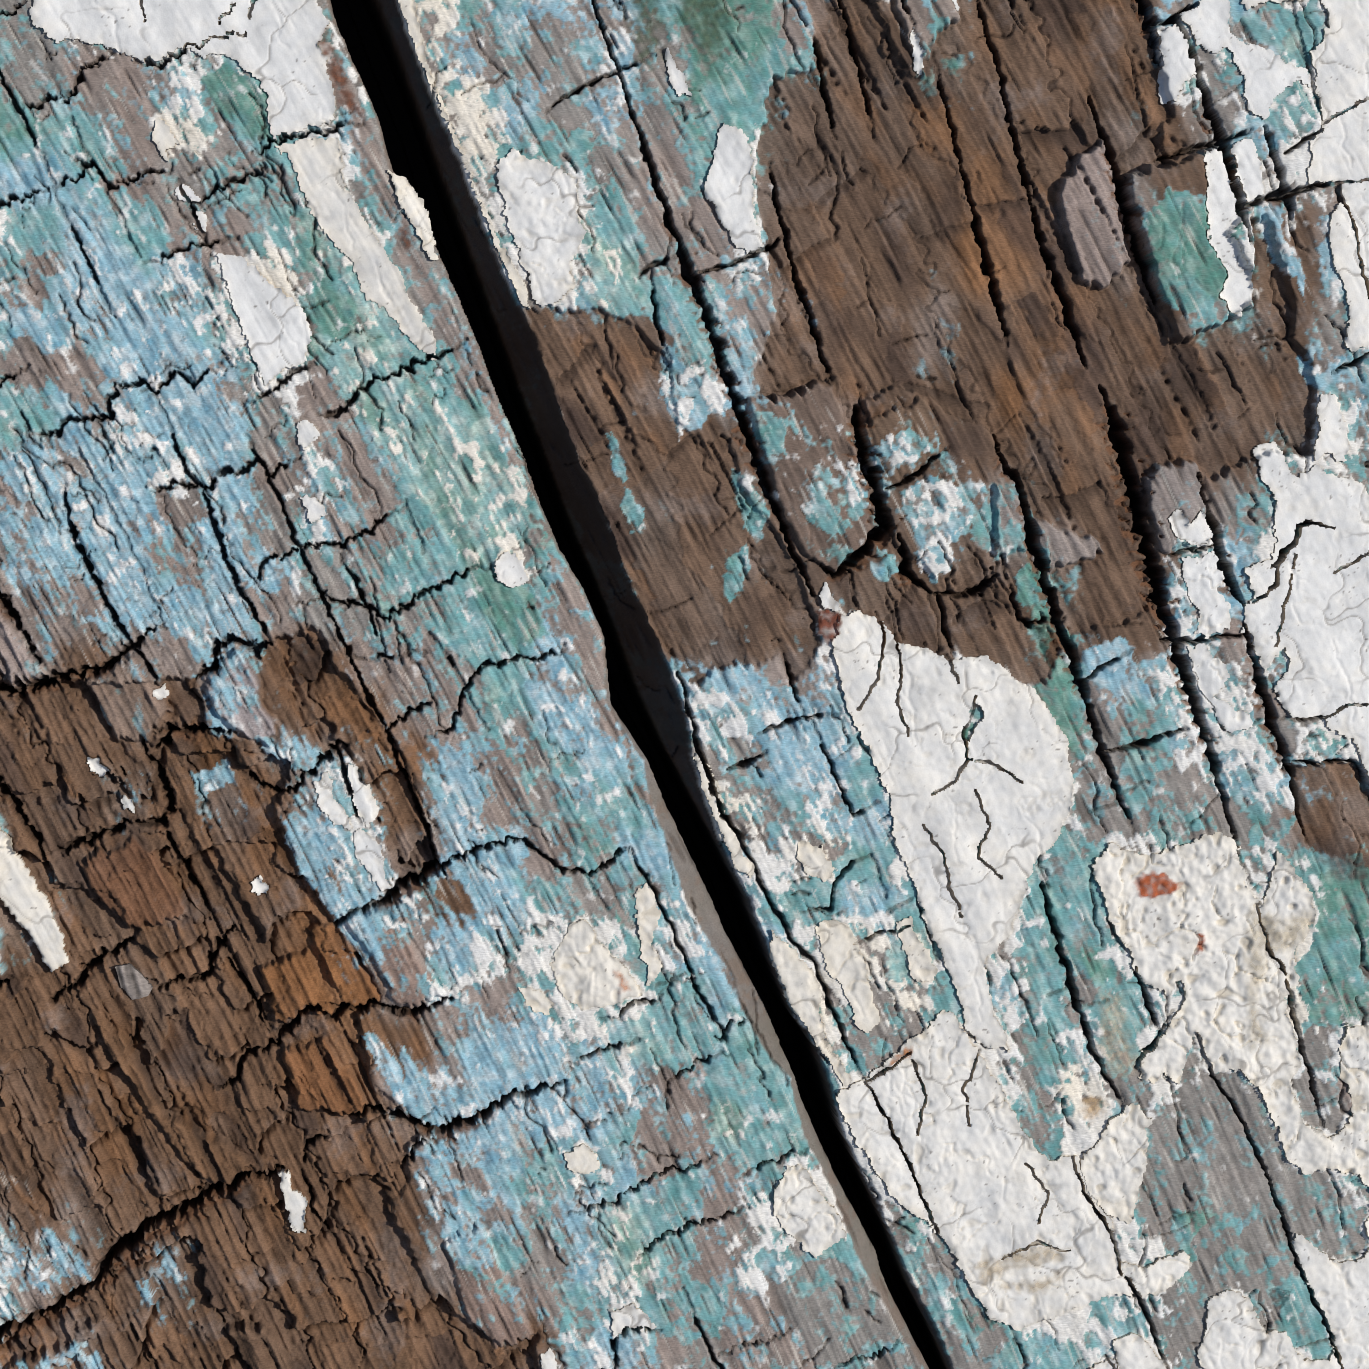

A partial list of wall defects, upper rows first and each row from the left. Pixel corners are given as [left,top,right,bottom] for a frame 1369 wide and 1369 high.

crack [0,1128,345,1334]
peeling [0,621,540,1369]
peeling [300,494,326,524]
peeling [293,372,384,517]
crack [0,356,747,1170]
crack [320,337,469,418]
peeling [525,307,822,686]
crack [545,0,1369,1232]
peeling [755,0,1350,741]
crack [1004,1156,1170,1369]
crack [1039,873,1342,1369]
peeling [1281,759,1369,1028]